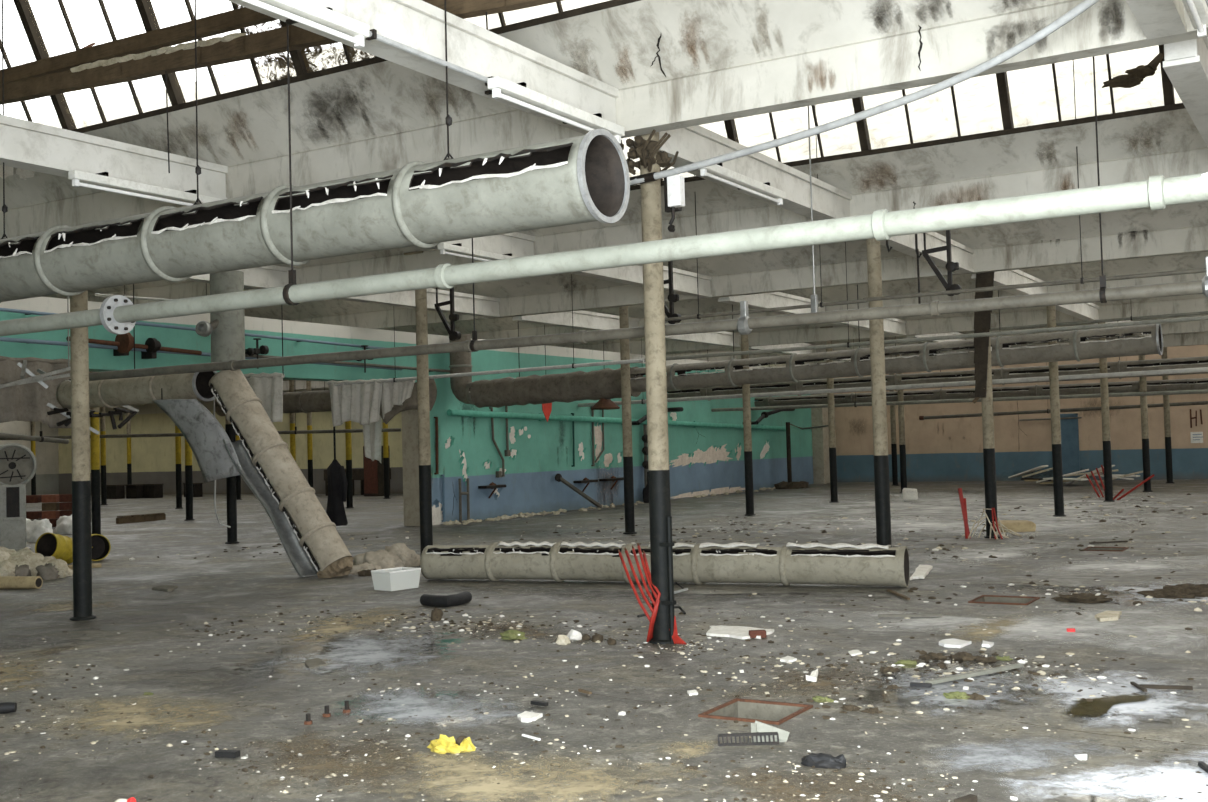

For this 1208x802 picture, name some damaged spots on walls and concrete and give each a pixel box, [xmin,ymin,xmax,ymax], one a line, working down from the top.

leakage [1103,0,1123,29]
leakage [312,91,368,131]
peeling [445,426,531,486]
peeling [669,442,742,468]